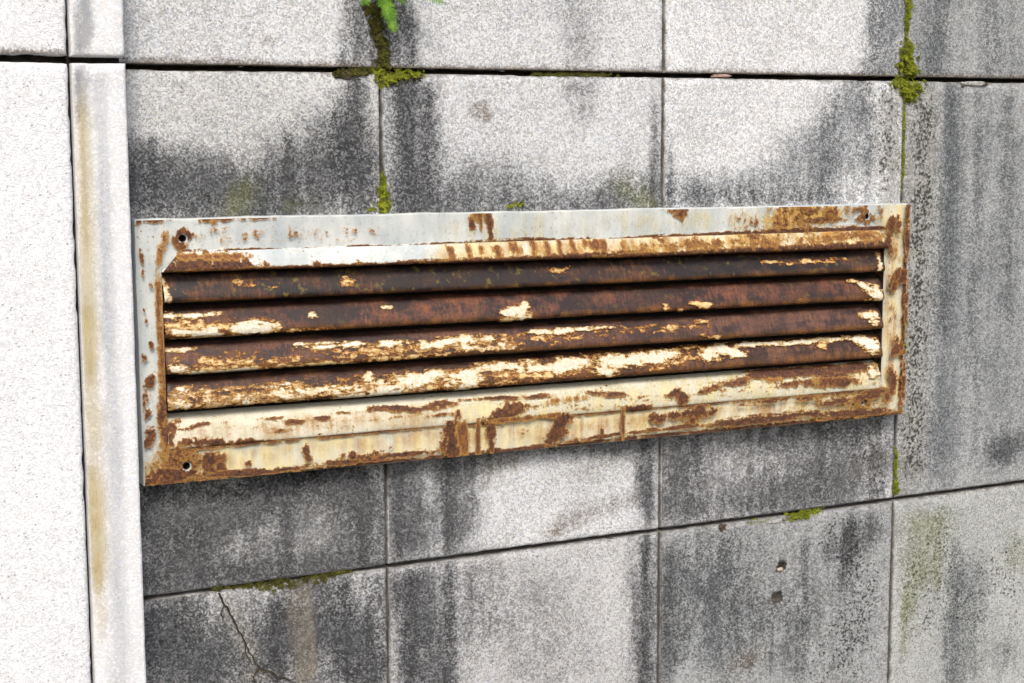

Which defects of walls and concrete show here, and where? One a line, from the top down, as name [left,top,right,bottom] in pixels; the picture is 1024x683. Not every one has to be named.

damp [128,0,906,219]
peeling [162,252,884,411]
corrosion [136,204,911,486]
damp [927,89,965,480]
crack [218,593,296,683]
damp [139,461,481,683]
damp [434,454,493,550]
damp [632,536,738,683]
damp [826,515,880,585]
damp [990,437,1024,463]